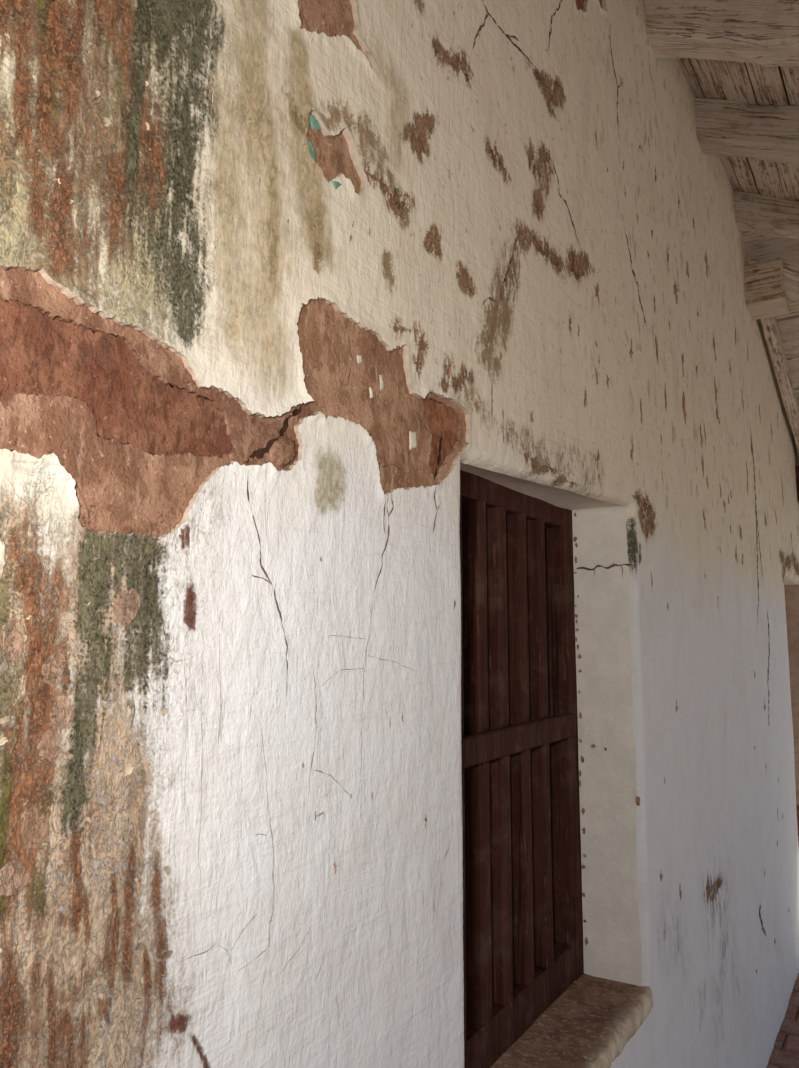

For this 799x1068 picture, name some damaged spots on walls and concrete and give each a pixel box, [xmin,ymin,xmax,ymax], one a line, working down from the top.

damp [116,0,224,347]
peeling [298,0,384,86]
damp [282,35,409,272]
peeling [307,108,415,220]
crack [473,0,562,67]
spalling [516,138,594,283]
peeling [0,265,474,537]
damp [49,530,170,837]
crack [247,480,418,822]
crack [577,562,630,578]
crack [182,632,325,1042]
damp [34,907,59,1066]